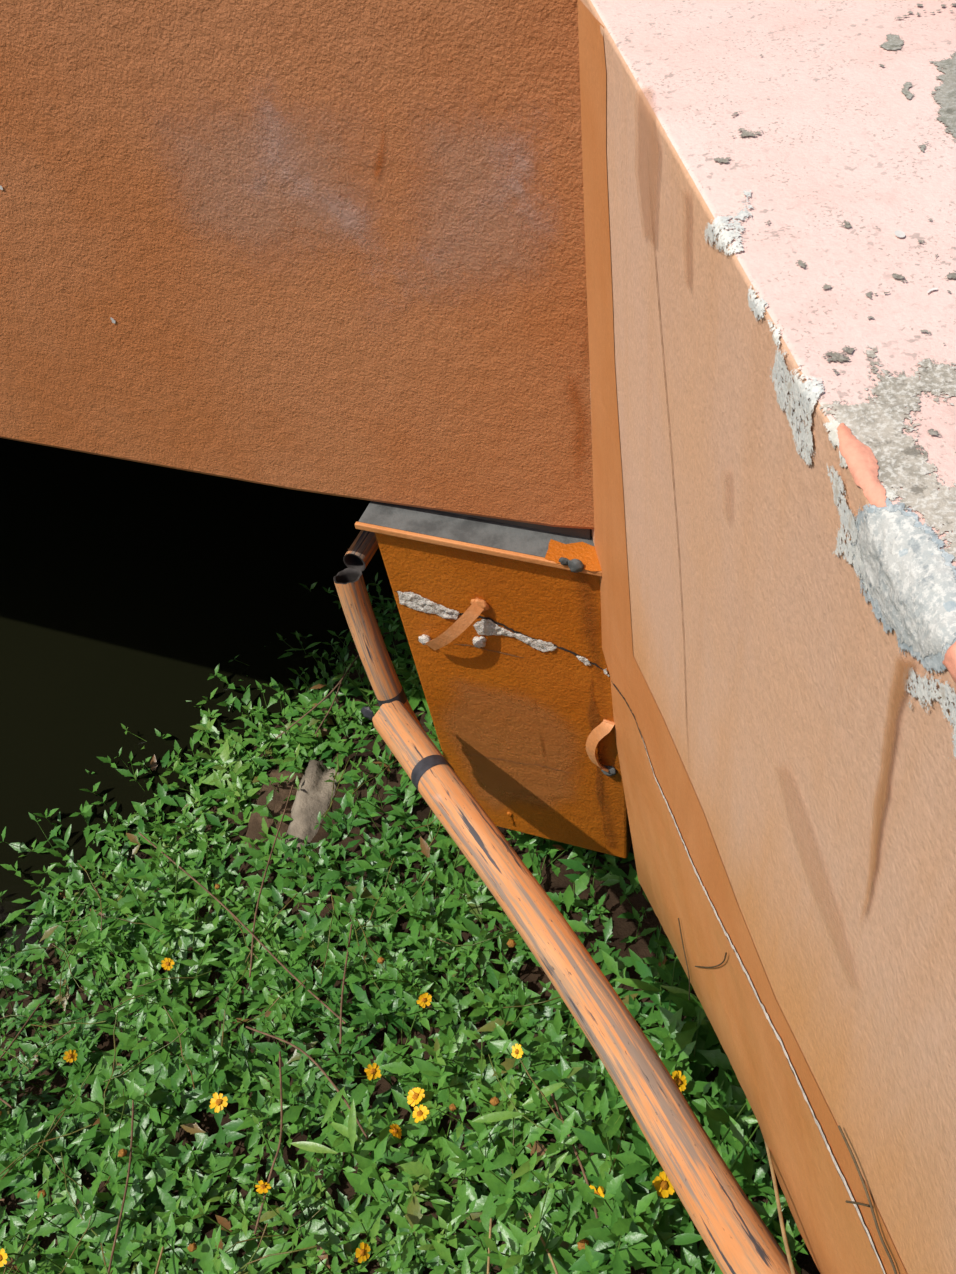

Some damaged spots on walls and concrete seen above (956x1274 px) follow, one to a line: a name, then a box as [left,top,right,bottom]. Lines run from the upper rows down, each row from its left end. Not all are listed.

peeling [880,33,904,50]
peeling [731,111,763,137]
peeling [901,82,914,99]
peeling [930,51,956,141]
damp [190,131,353,232]
damp [437,141,516,275]
peeling [704,190,770,256]
spalling [748,274,956,758]